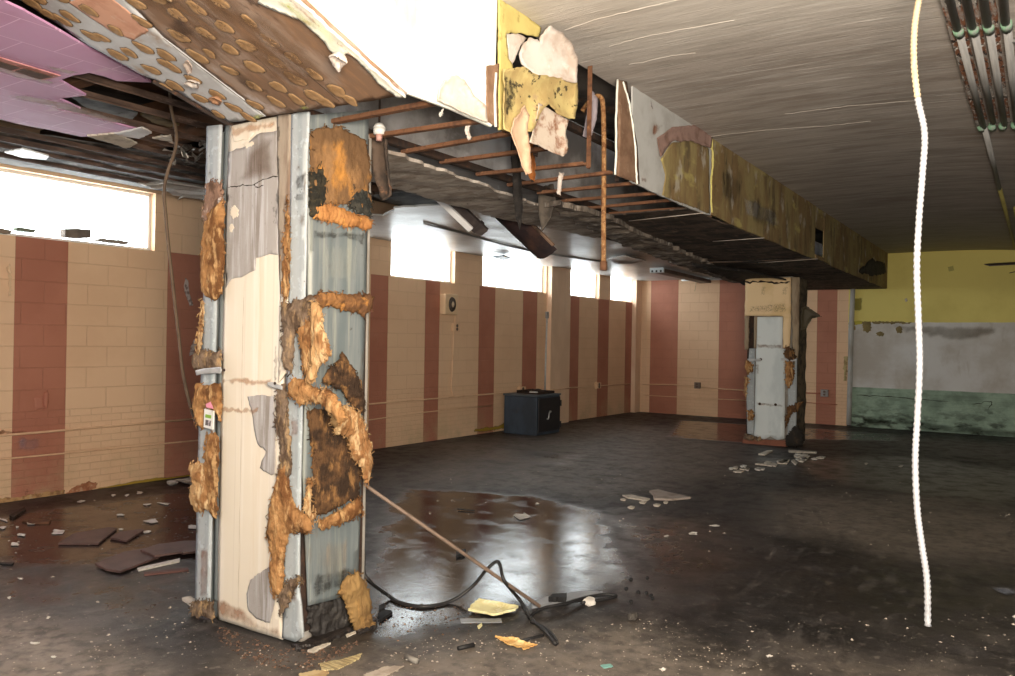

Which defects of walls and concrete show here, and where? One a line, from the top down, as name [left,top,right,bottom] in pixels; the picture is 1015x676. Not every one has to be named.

leakage [657,125,713,157]
peeling [225,130,279,287]
peeling [248,395,276,475]
peeling [246,567,275,623]